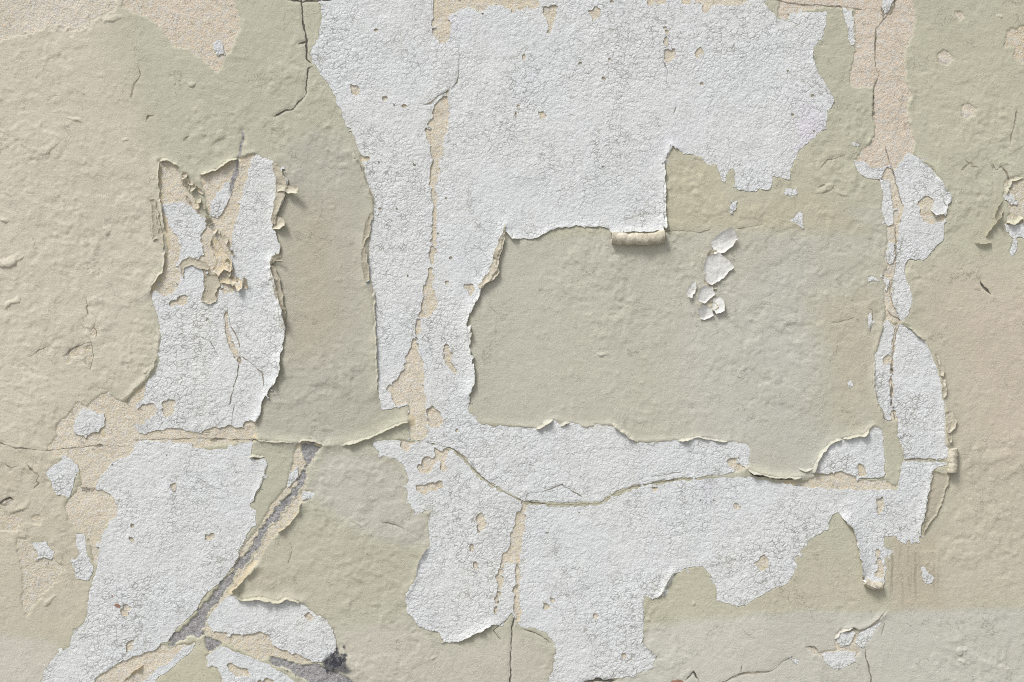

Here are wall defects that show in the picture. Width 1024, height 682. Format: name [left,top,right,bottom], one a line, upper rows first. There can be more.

flaking render [0,0,240,72]
crack [275,0,330,116]
peeling [310,0,958,682]
crack [0,301,320,652]
peeling [17,155,338,682]
crack [428,442,685,505]
crack [270,656,352,682]